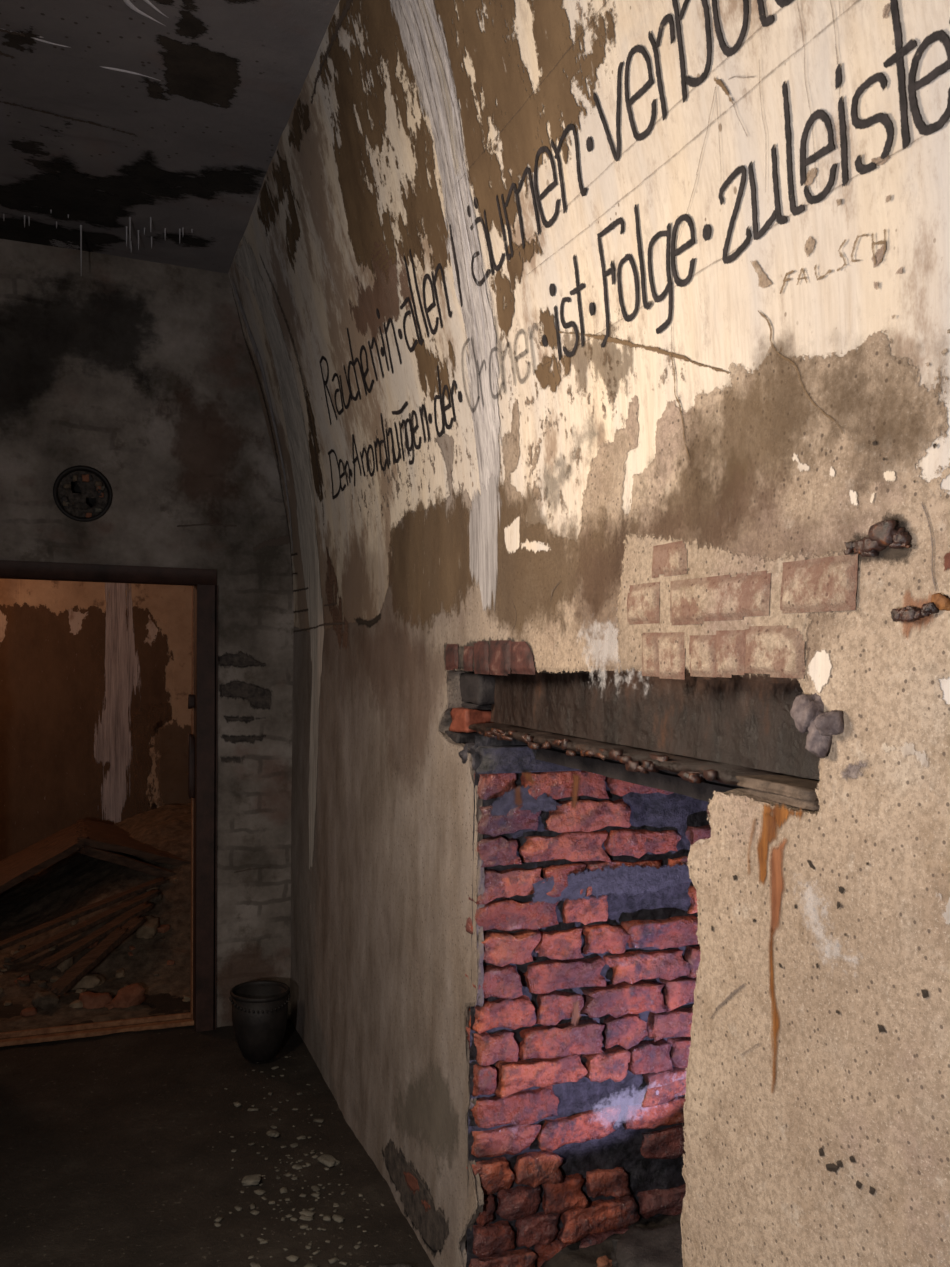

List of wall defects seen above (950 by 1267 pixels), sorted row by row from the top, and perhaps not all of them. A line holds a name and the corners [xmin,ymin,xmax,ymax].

peeling [575,0,615,66]
leakage [0,96,310,273]
leakage [319,0,810,634]
rust [850,534,911,562]
rust [882,514,907,532]
rust [903,592,950,638]
peeling [290,315,950,1267]
rust [748,805,802,1092]